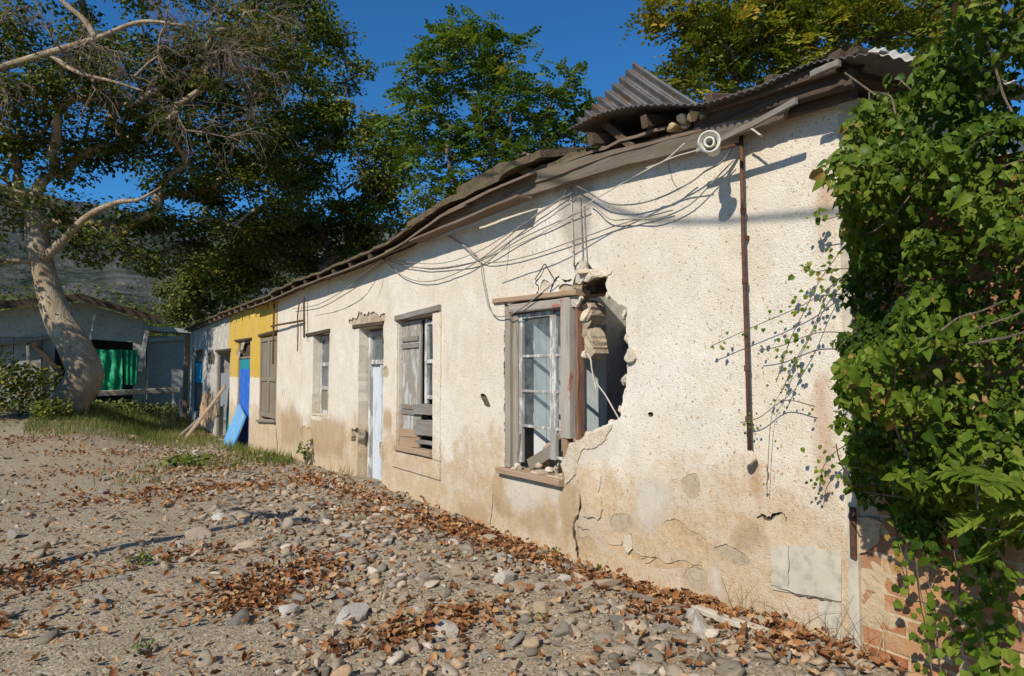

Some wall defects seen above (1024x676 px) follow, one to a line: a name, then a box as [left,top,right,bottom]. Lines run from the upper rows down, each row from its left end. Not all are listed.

spalling [681,473,700,498]
crack [757,464,787,522]
spalling [608,513,749,569]